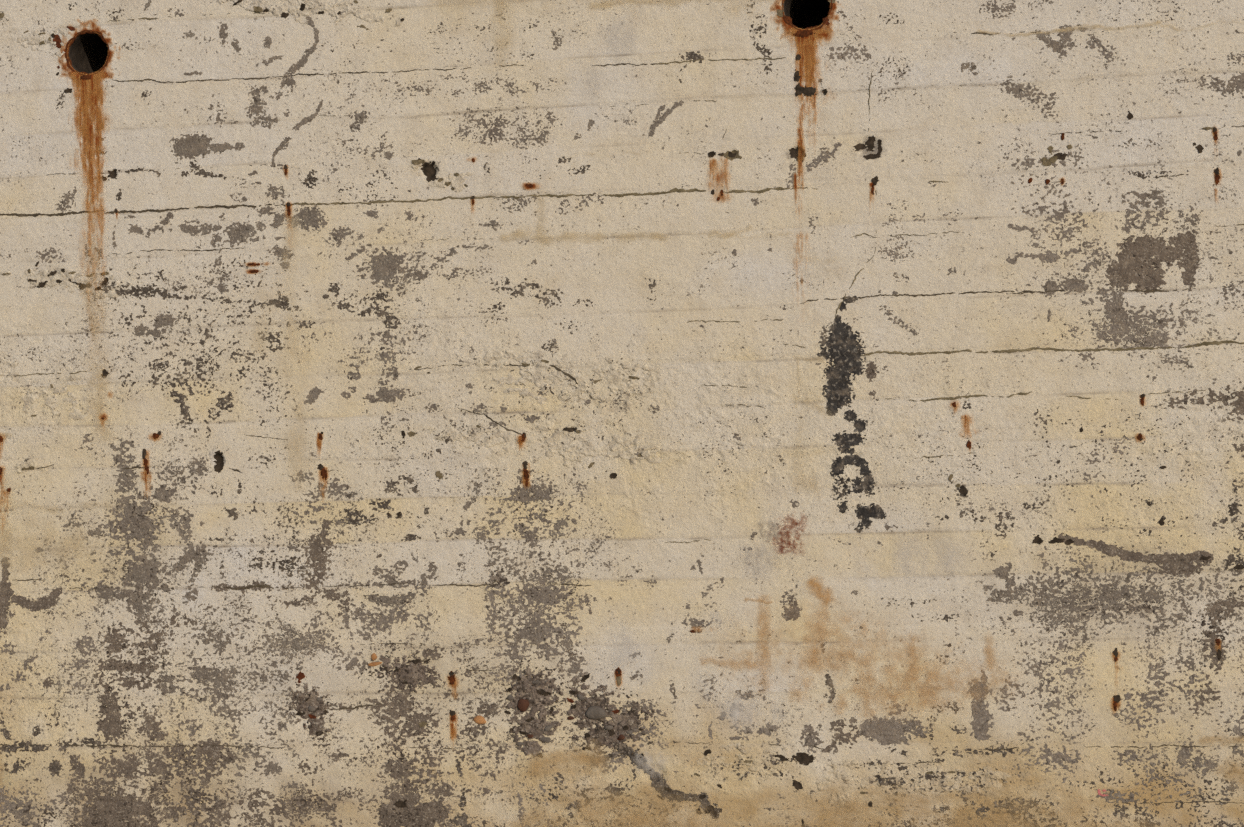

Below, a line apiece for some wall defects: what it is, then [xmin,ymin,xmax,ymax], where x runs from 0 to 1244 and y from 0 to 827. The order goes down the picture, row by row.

rust [59,19,118,245]
rust [710,160,727,201]
rust [771,0,839,199]
peeling [839,296,858,320]
peeling [998,134,1244,382]
peeling [634,399,783,497]